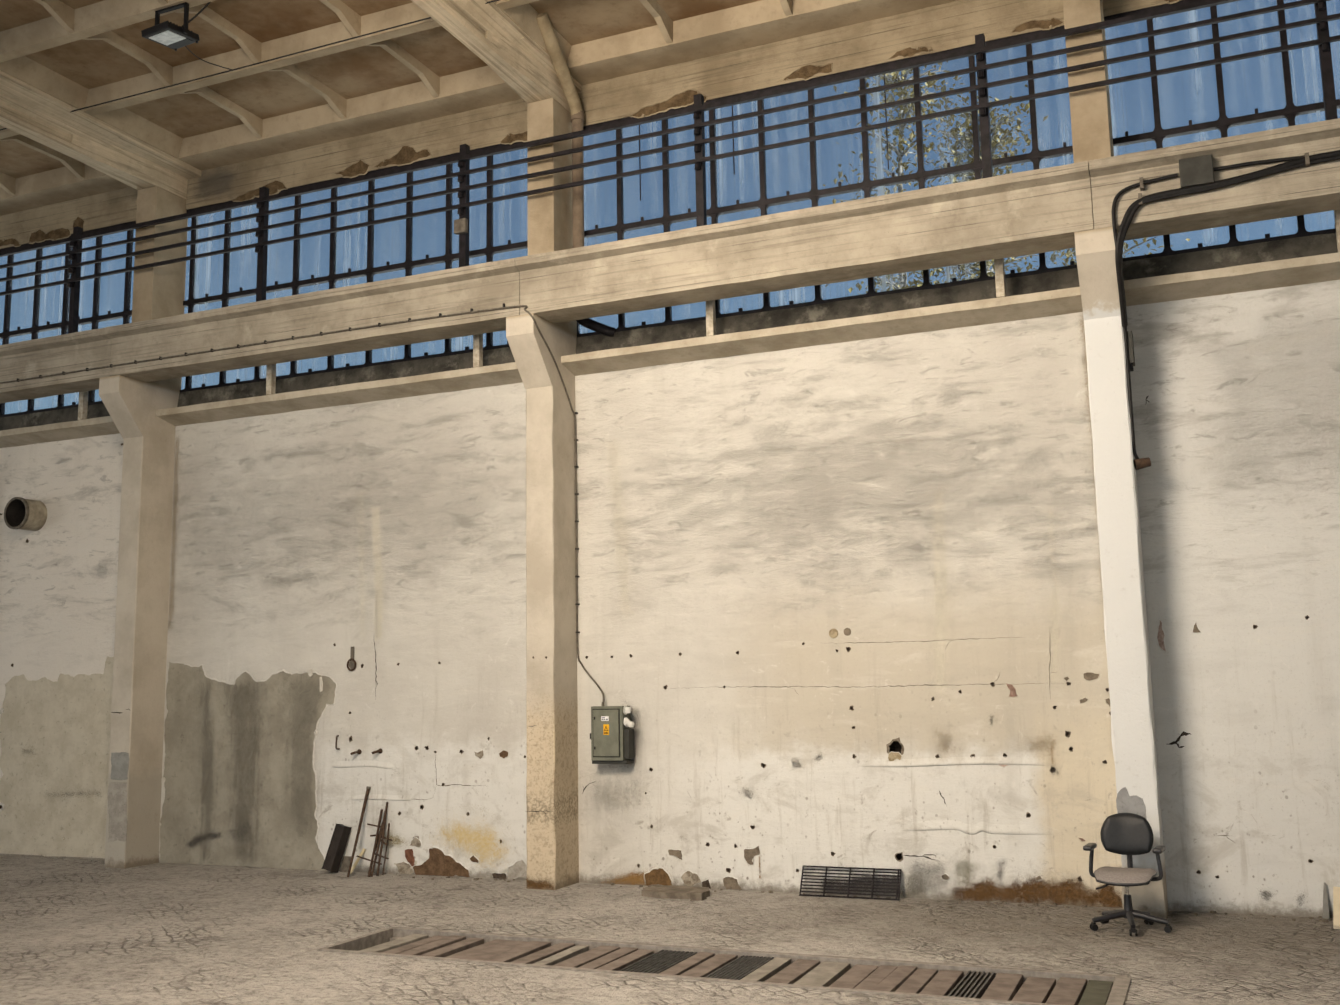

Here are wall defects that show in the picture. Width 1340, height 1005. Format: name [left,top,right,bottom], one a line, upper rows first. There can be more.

spalling [1011,16,1064,34]
spalling [619,89,708,118]
spalling [334,145,432,178]
spalling [0,216,85,248]
flaking render [0,655,129,858]
flaking render [159,661,337,871]
damp [193,669,333,866]
spalling [886,738,904,761]
spalling [356,802,527,882]
damp [427,810,520,877]
spalling [637,849,743,892]
spalling [734,844,761,866]